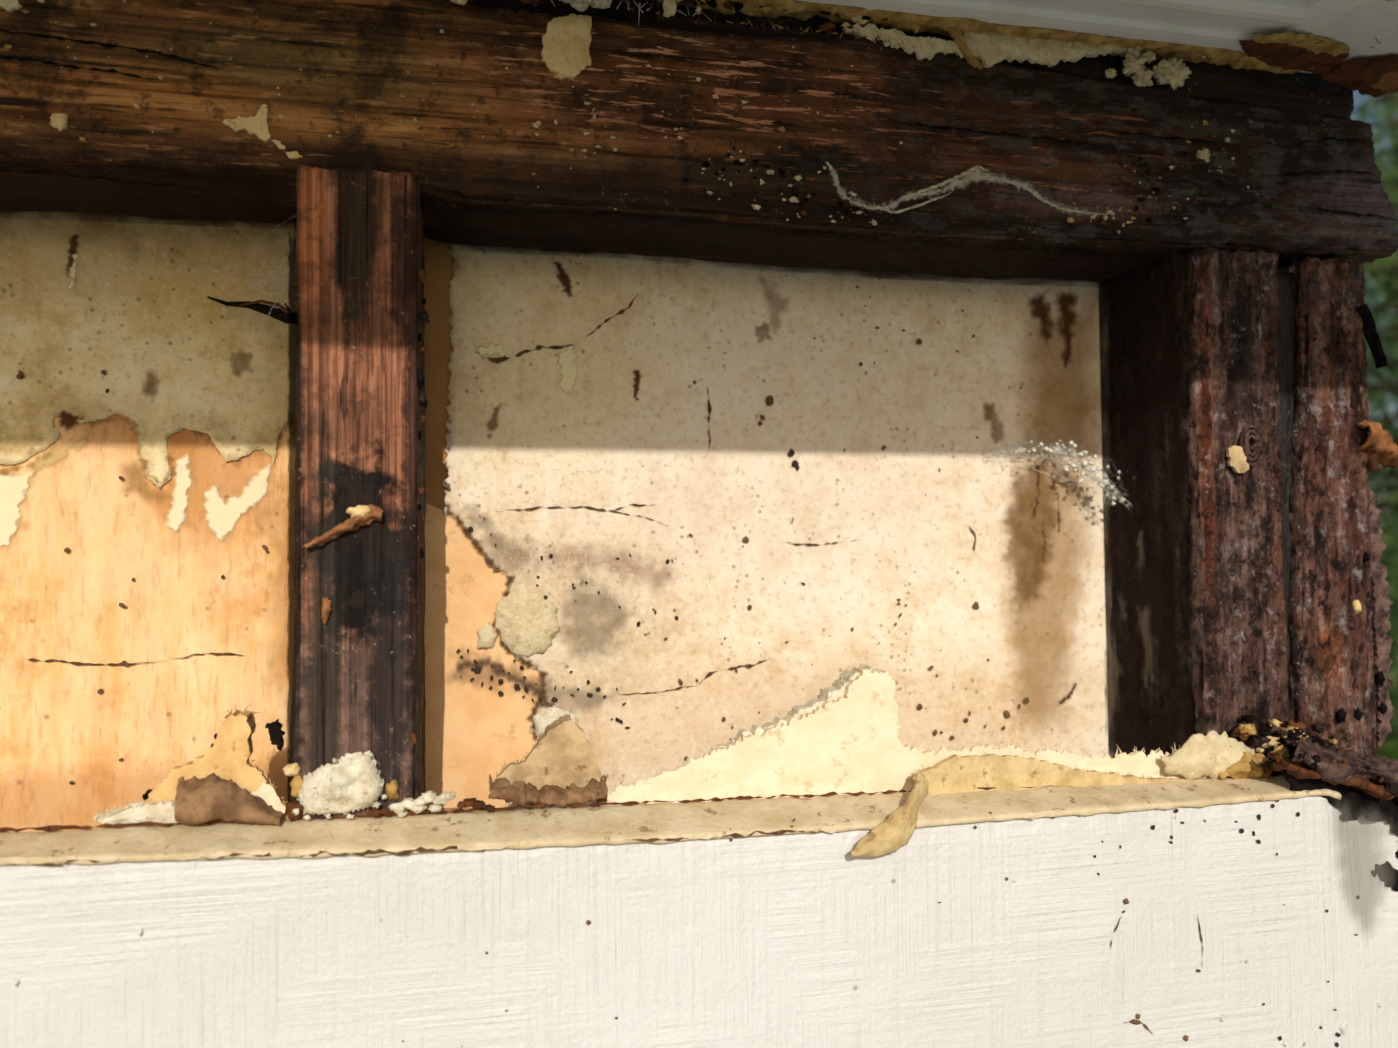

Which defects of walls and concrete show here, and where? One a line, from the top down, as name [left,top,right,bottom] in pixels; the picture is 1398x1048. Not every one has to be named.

crack [476,293,638,395]
crack [498,504,668,526]
damp [964,294,1084,730]
peeling [0,414,289,832]
crack [18,652,250,666]
spalling [1336,671,1388,723]
peeling [1268,737,1398,892]
peeling [0,855,76,865]
peeling [263,848,325,857]